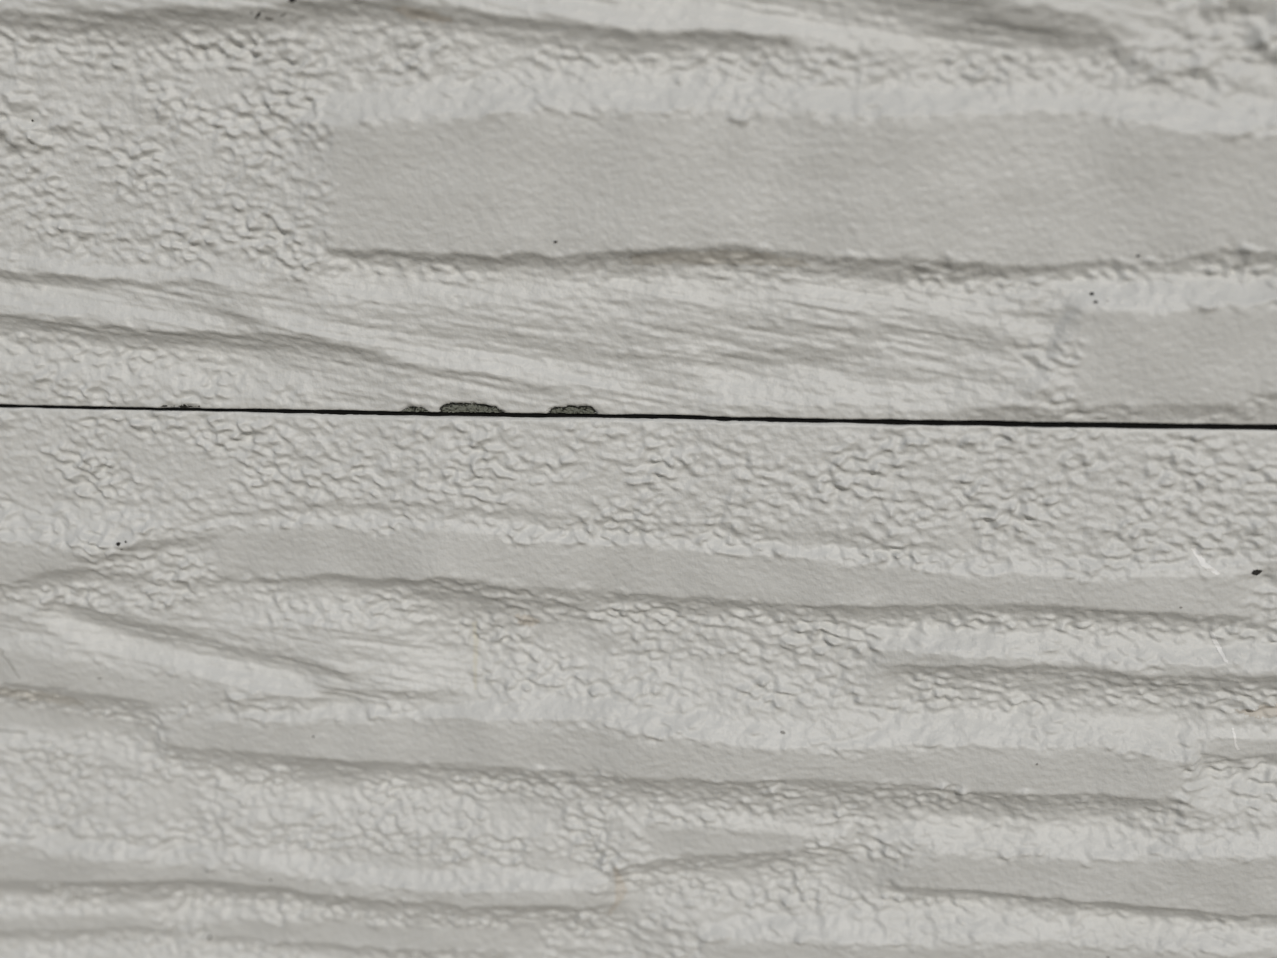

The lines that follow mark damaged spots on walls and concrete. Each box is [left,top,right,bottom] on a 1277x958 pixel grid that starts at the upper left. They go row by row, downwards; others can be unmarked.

spalling [403,402,502,413]
spalling [549,405,596,414]